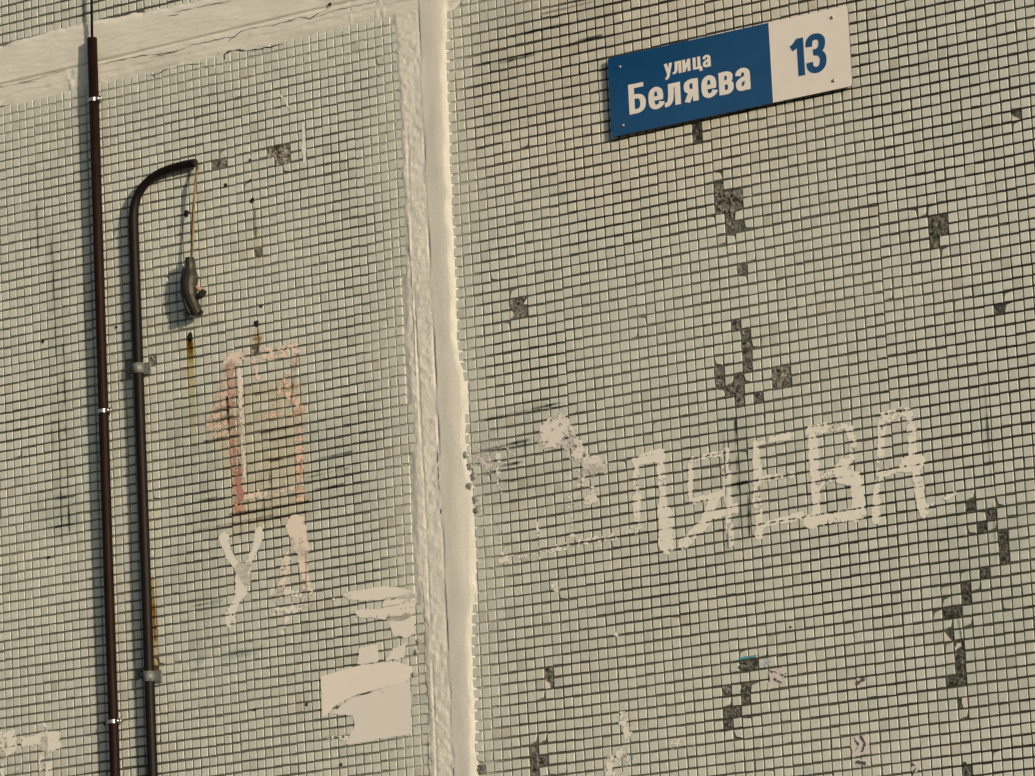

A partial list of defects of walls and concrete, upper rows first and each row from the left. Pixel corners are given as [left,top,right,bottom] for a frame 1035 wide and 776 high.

peeling [267,144,290,166]
peeling [693,122,702,144]
peeling [714,182,744,233]
peeling [929,214,948,249]
peeling [715,320,763,407]
peeling [772,365,791,389]
peeling [966,501,1009,564]
peeling [943,568,990,708]
peeling [722,659,786,729]
peeling [530,746,548,776]